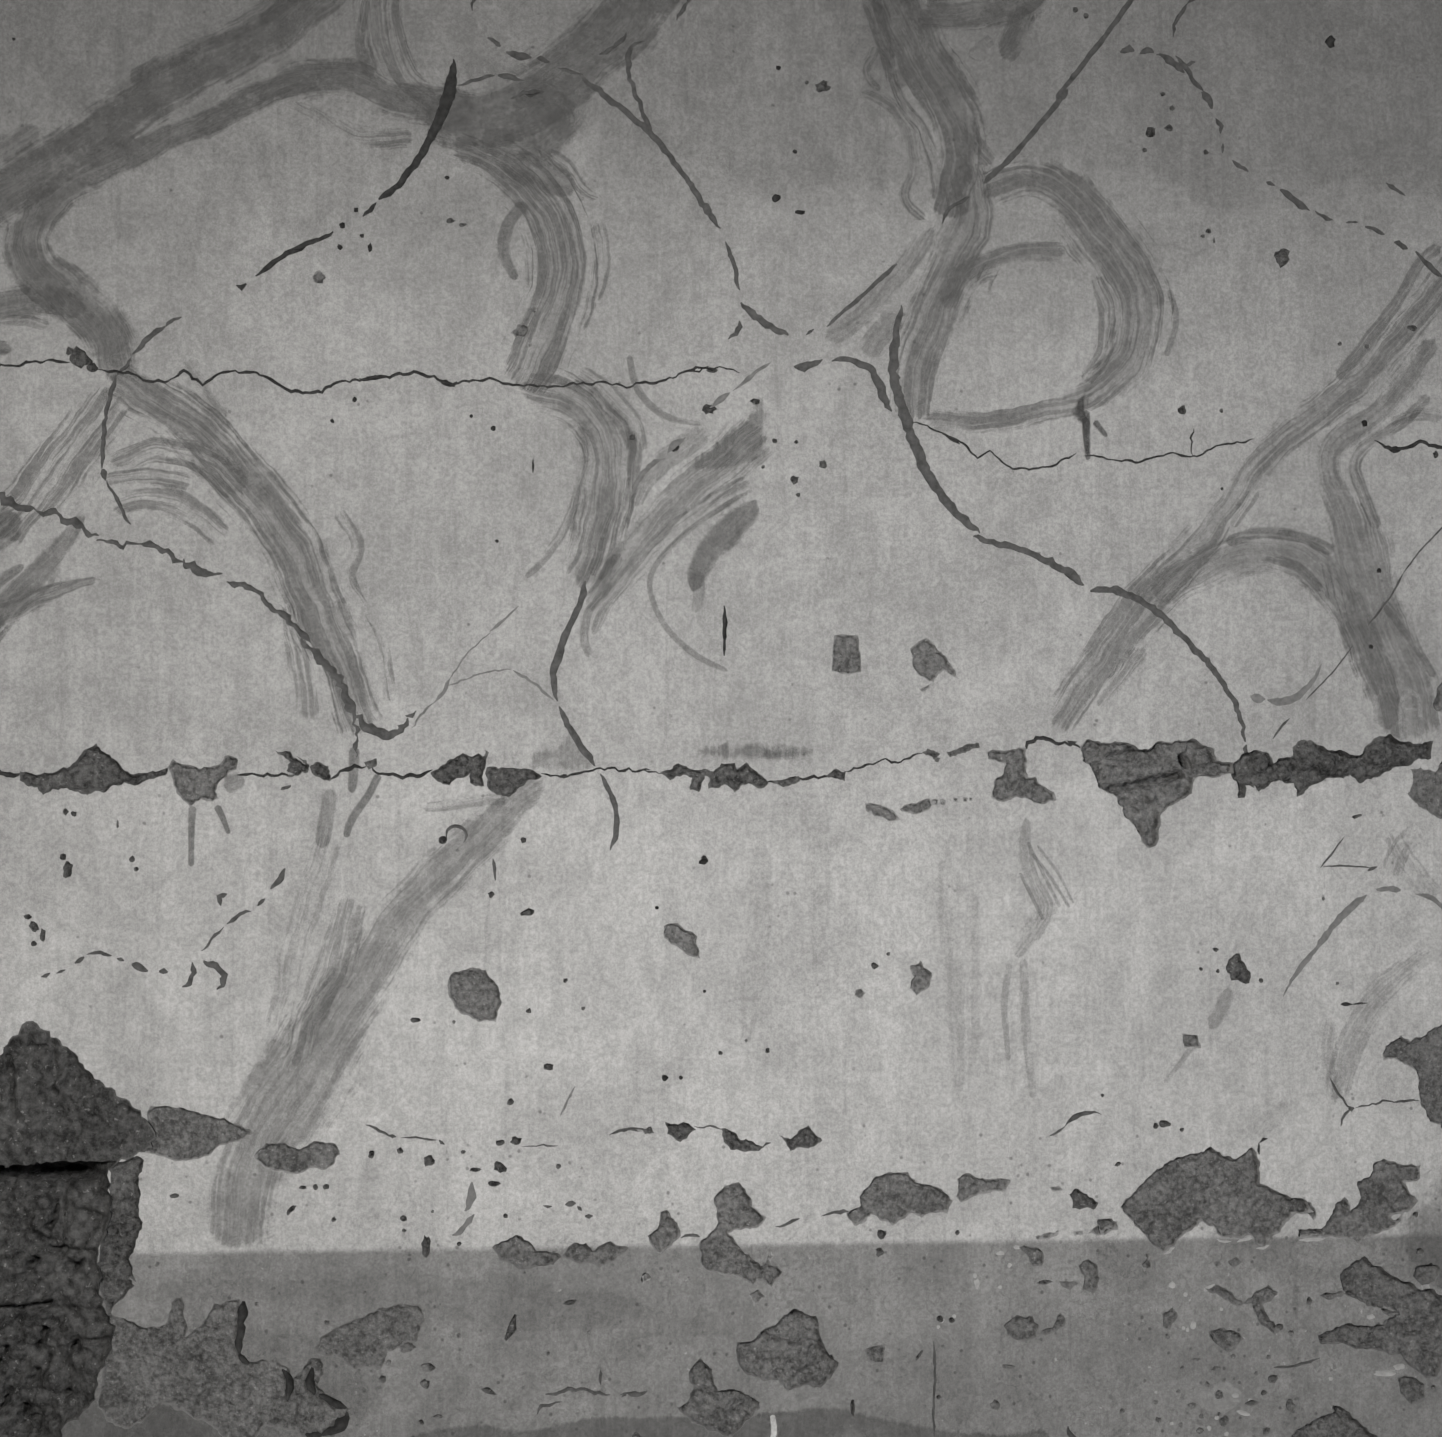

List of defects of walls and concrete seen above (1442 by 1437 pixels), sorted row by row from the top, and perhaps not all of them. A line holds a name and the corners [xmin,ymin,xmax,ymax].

crack [0,0,1442,850]
spalling [1079,734,1442,848]
spalling [447,967,502,1024]
spalling [1383,1025,1442,1129]
spalling [461,1136,522,1187]
spalling [0,1021,425,1437]
spalling [648,1210,681,1254]
spalling [699,1182,785,1306]
spalling [846,1172,1011,1257]
spalling [996,1147,1442,1405]
spalling [677,1356,760,1437]
spalling [736,1309,839,1391]